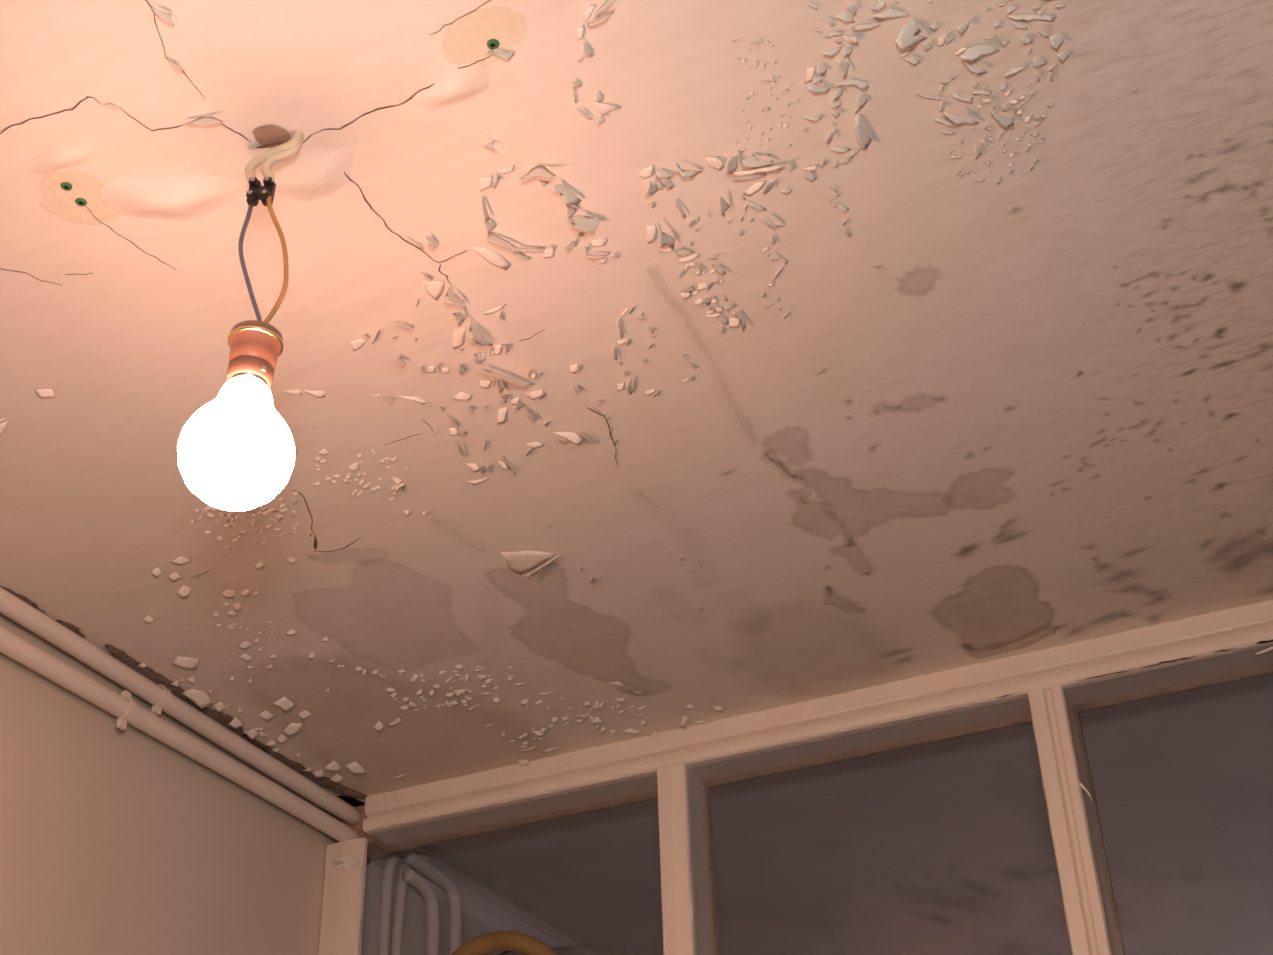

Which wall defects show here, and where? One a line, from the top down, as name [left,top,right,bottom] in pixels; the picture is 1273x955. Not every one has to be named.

crack [0,268,91,285]
crack [0,96,183,134]
crack [90,211,176,270]
crack [145,0,249,141]
crack [302,56,490,285]
peeling [470,165,620,270]
peeling [639,0,1069,334]
peeling [372,272,598,485]
peeling [613,306,660,397]
peeling [313,449,408,502]
flaking render [1,587,84,638]
flaking render [105,644,367,799]